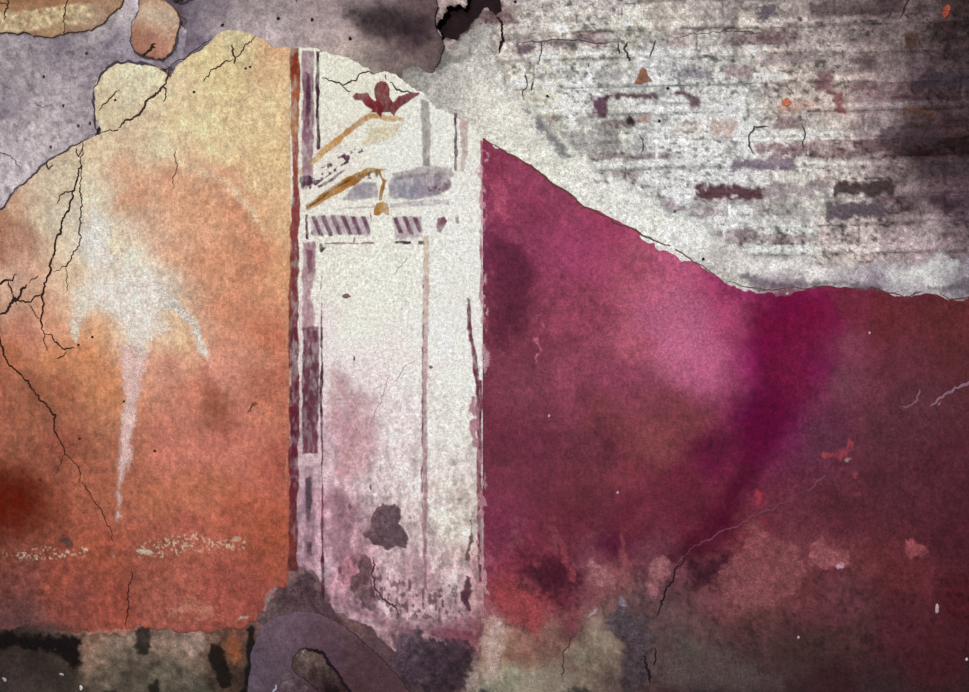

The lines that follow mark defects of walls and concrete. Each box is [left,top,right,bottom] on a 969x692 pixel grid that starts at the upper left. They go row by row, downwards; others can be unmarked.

flaking render [0,0,505,208]
crack [324,71,412,93]
spalling [634,67,652,84]
crack [0,0,256,359]
damp [70,270,208,517]
crack [369,360,415,426]
crack [0,338,115,547]
damp [136,534,245,557]
crack [657,548,694,616]
spalling [292,648,349,692]
crack [561,634,576,682]
crack [643,647,657,682]